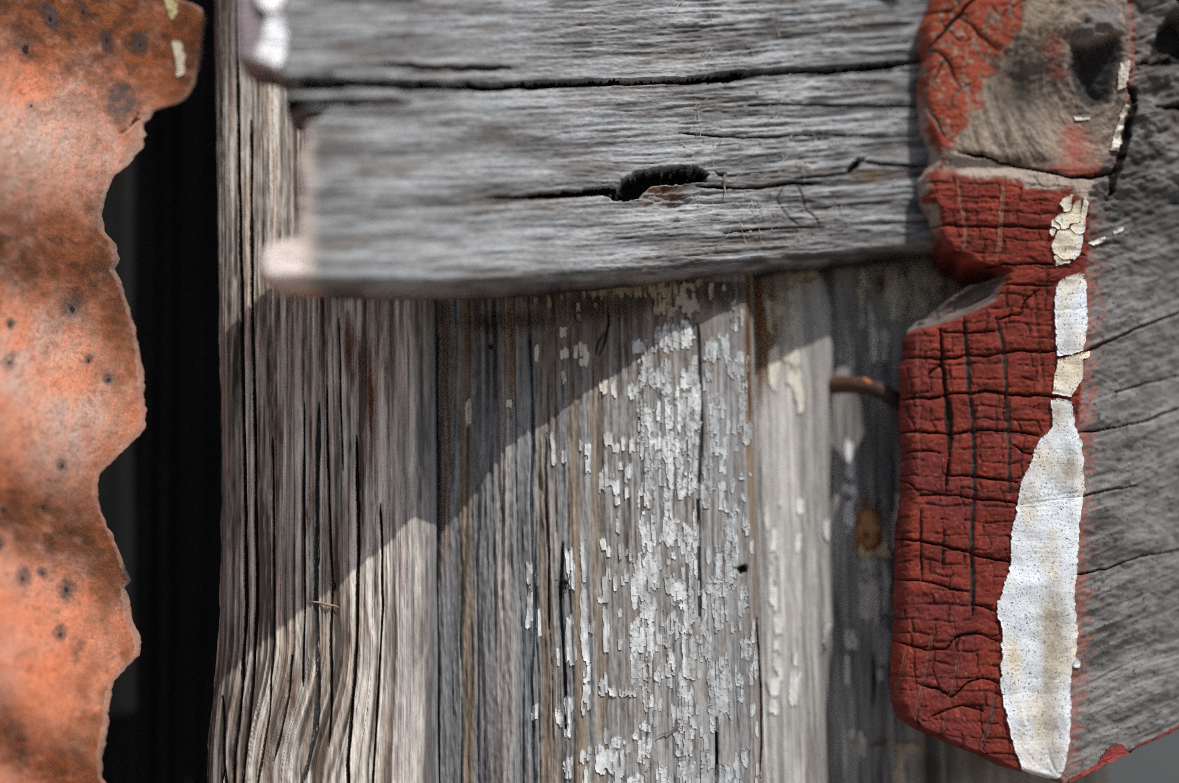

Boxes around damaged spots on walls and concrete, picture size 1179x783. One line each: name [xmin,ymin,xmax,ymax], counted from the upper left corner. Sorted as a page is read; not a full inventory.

rust [0,0,202,116]
rust [0,216,137,384]
crack [222,12,384,783]
crack [284,0,1179,783]
peeling [764,271,822,414]
rust [0,483,125,601]
peeling [525,561,542,639]
peeling [549,278,804,783]
peeling [996,194,1179,783]
rust [0,714,100,783]
peeling [531,703,539,720]